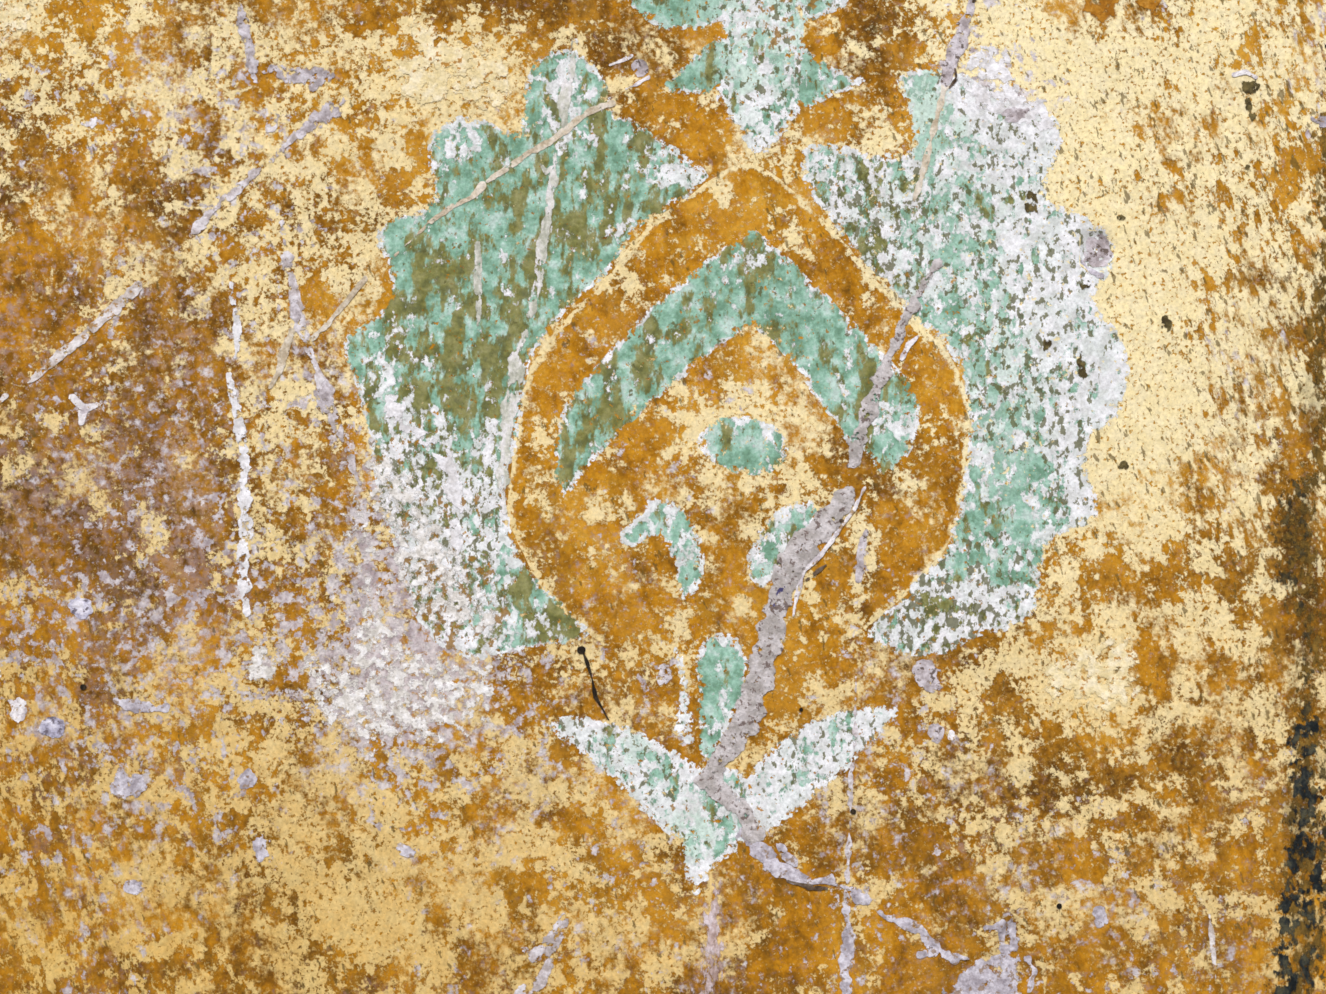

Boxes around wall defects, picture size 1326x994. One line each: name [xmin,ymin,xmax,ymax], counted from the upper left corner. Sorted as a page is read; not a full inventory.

leakage [1263,112,1326,994]
crack [736,676,969,994]
flaking render [942,918,1038,994]